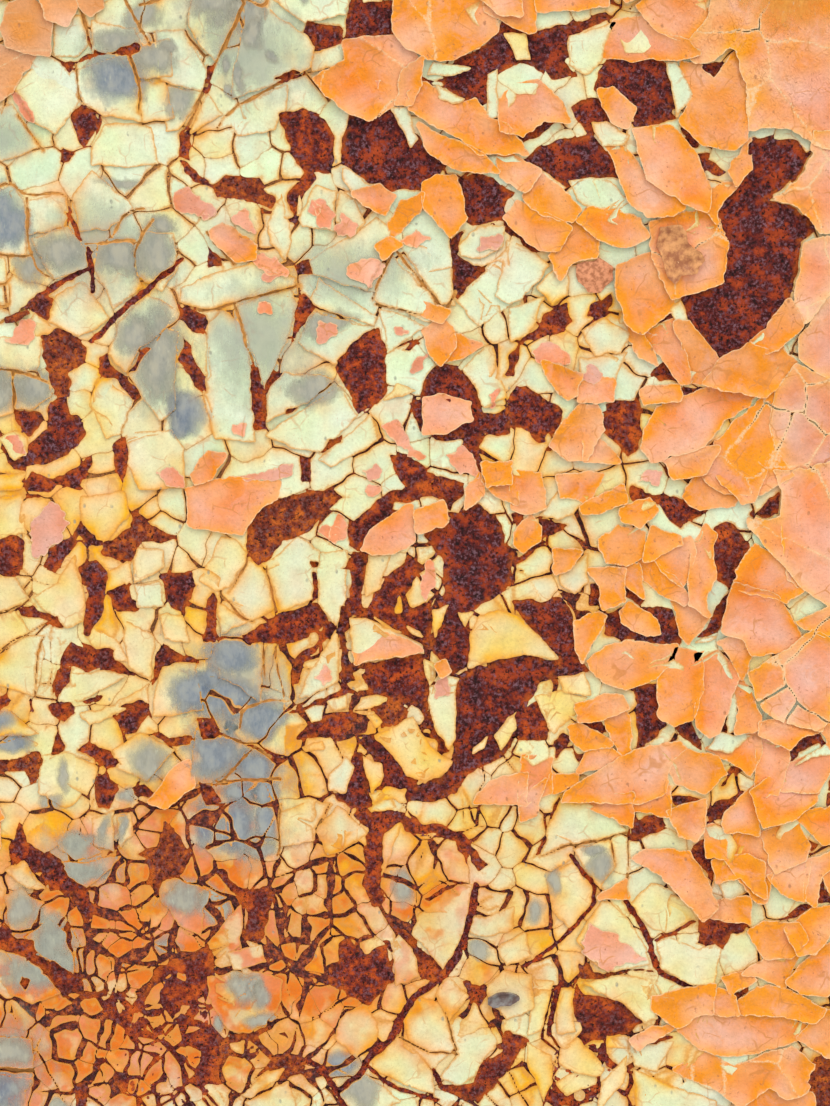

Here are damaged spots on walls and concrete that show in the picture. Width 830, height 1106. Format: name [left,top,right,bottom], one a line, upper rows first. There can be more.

corrosion [0,0,10,41]
corrosion [15,0,159,241]
peeling [0,170,178,309]
peeling [0,0,243,161]
crack [0,0,326,374]
crack [499,200,701,372]
crack [514,525,649,616]
crack [0,645,830,1106]
peeling [545,839,631,928]
peeling [403,997,455,1069]
corrosion [372,901,830,1106]
peeling [650,942,830,1057]